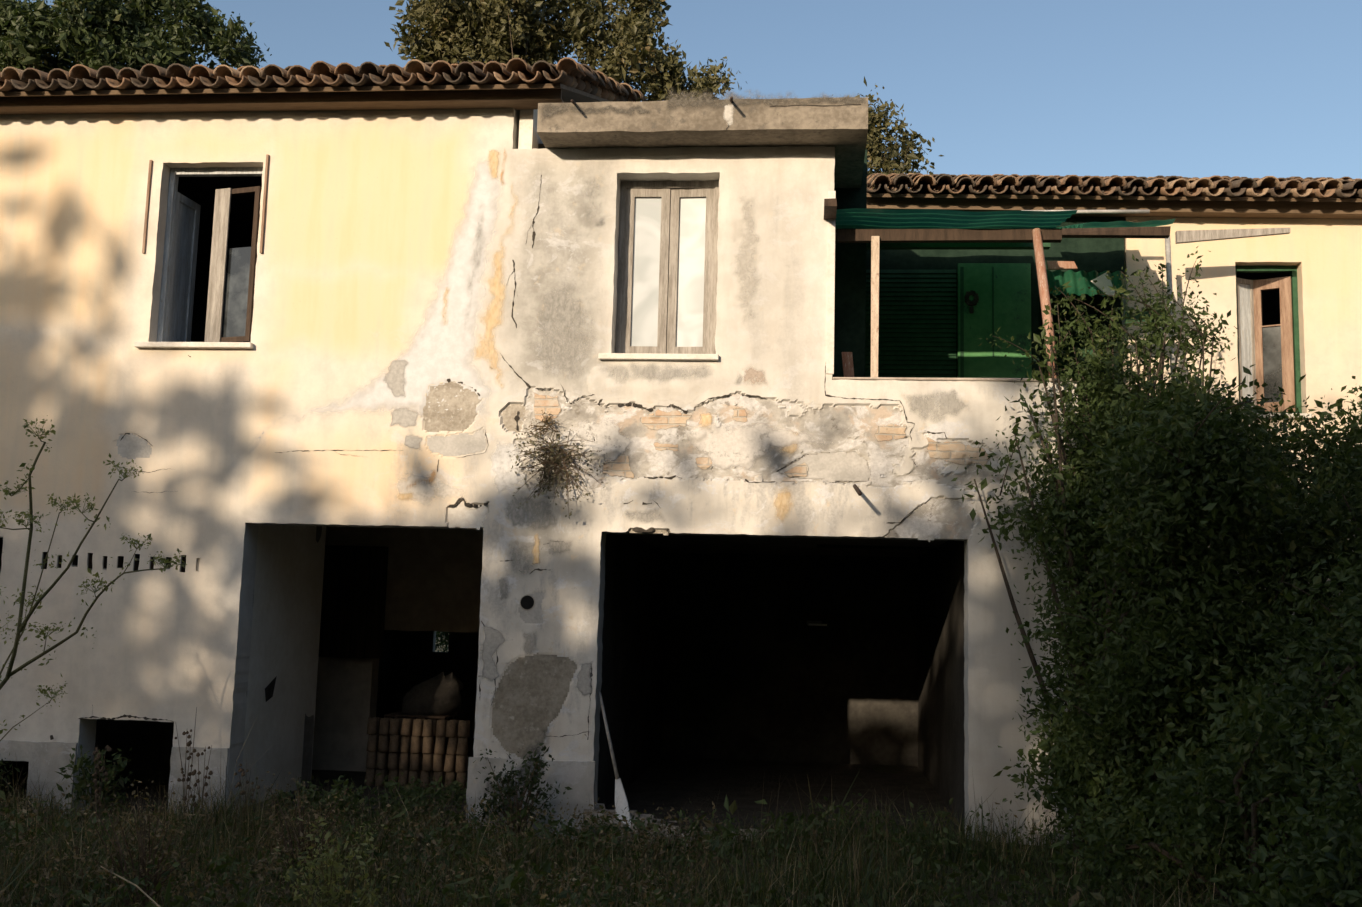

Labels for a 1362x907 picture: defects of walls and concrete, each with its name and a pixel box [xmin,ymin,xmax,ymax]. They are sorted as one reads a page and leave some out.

water stain [323,150,504,414]
peeling [116,433,152,459]
crack [276,449,403,457]
spalling [385,360,486,456]
spalling [501,388,1003,542]
spalling [448,501,488,530]
spalling [482,627,592,759]